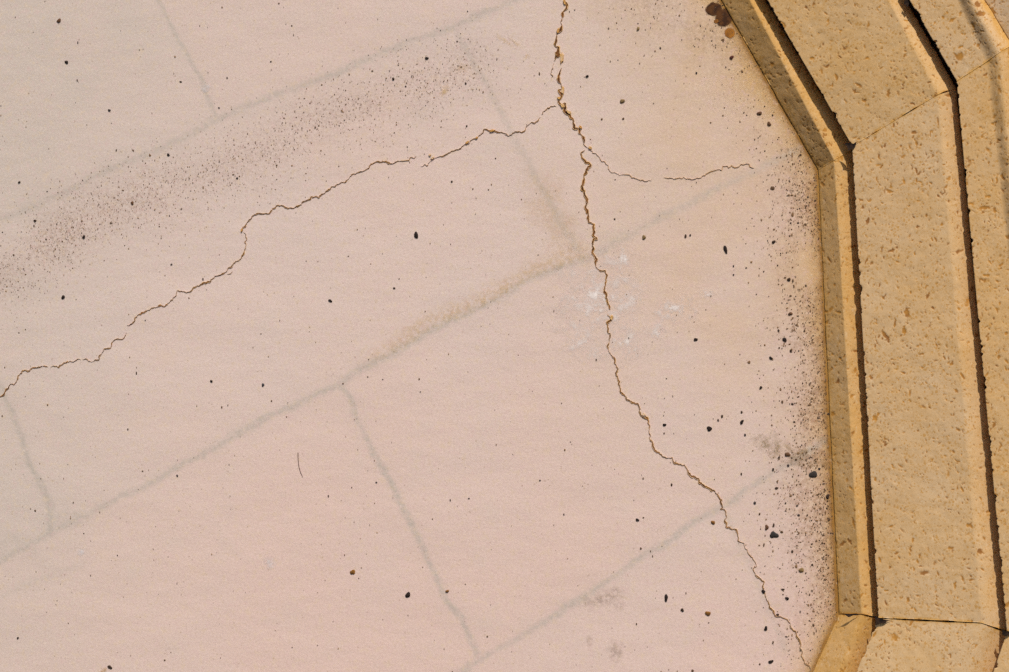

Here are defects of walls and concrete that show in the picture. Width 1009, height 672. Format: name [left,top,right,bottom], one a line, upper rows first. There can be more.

crack [0,157,413,397]
crack [423,0,811,672]
corrosion [705,0,841,672]
damp [740,95,837,664]